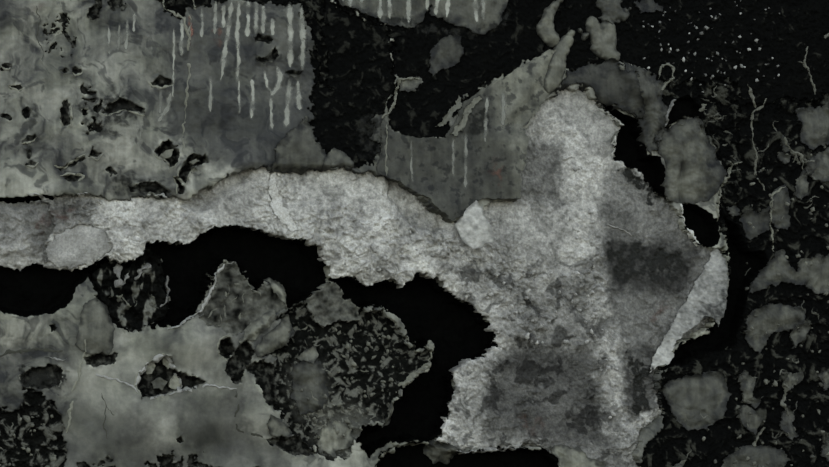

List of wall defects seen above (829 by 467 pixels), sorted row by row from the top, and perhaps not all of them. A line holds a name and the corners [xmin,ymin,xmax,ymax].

leakage [158,23,184,122]
peeling [158,0,227,20]
leakage [200,1,275,112]
leakage [264,68,302,128]
leakage [287,6,306,68]
peeling [269,0,556,175]
leakage [367,0,464,35]
peeling [553,0,605,72]
peeling [614,0,829,272]
spalling [0,49,731,467]
crack [0,339,269,440]
peeling [636,282,829,467]